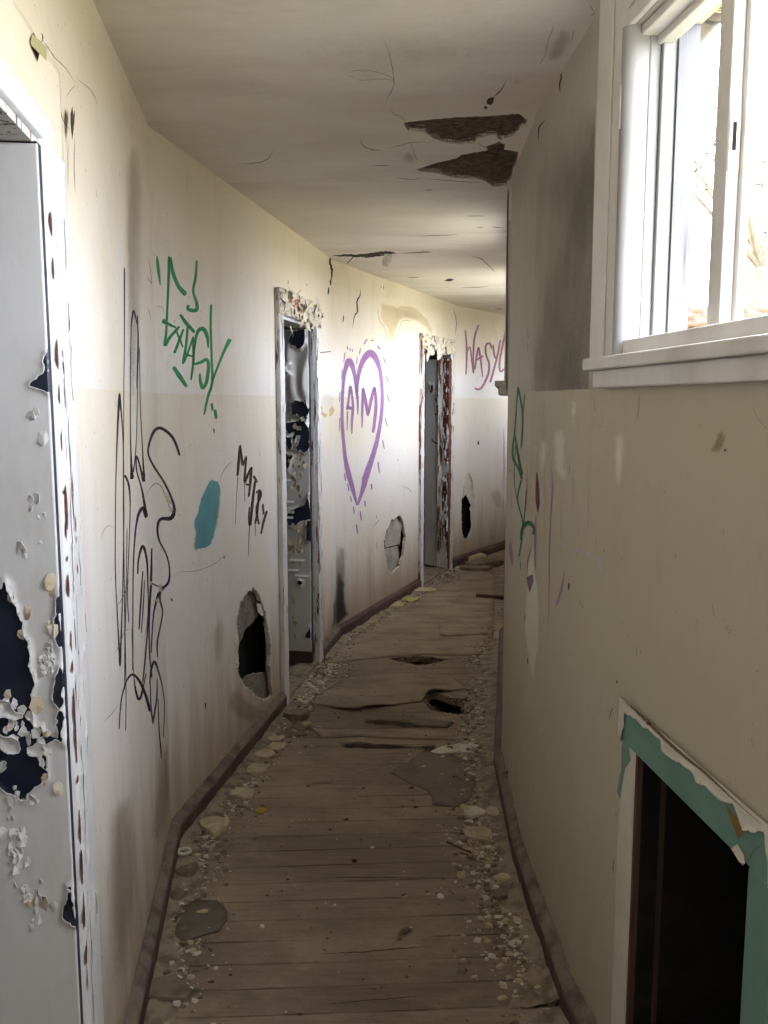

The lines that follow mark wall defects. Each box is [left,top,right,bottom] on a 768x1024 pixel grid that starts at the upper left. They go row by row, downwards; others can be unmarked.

crack [484,83,505,109]
crack [288,234,454,330]
peeling [0,142,104,1024]
peeling [234,286,334,705]
spalling [383,514,406,574]
peeling [420,333,475,587]
peeling [617,696,768,888]